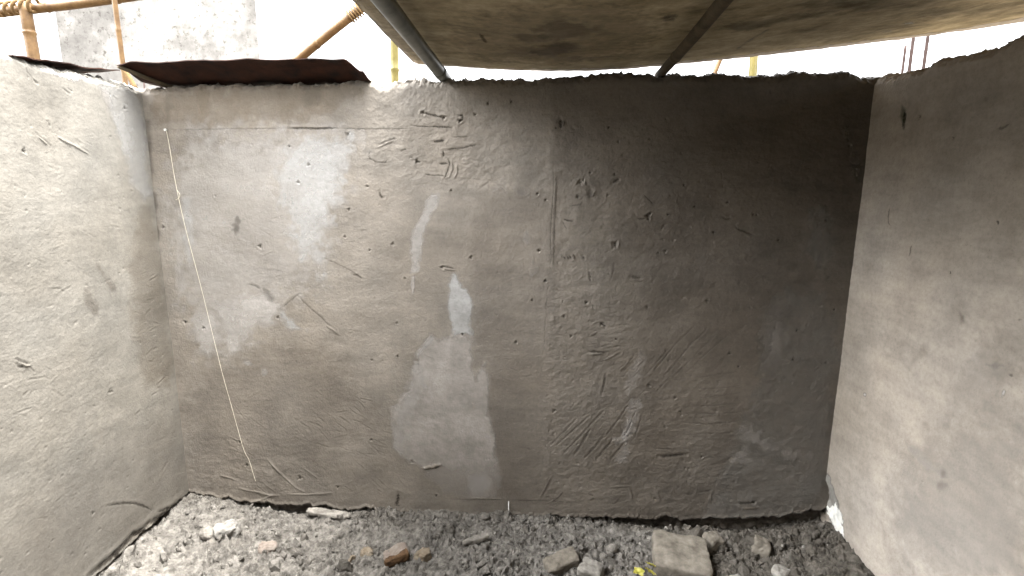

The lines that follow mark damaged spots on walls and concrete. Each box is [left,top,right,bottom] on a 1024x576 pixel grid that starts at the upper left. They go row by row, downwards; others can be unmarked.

leakage [391,274,497,475]